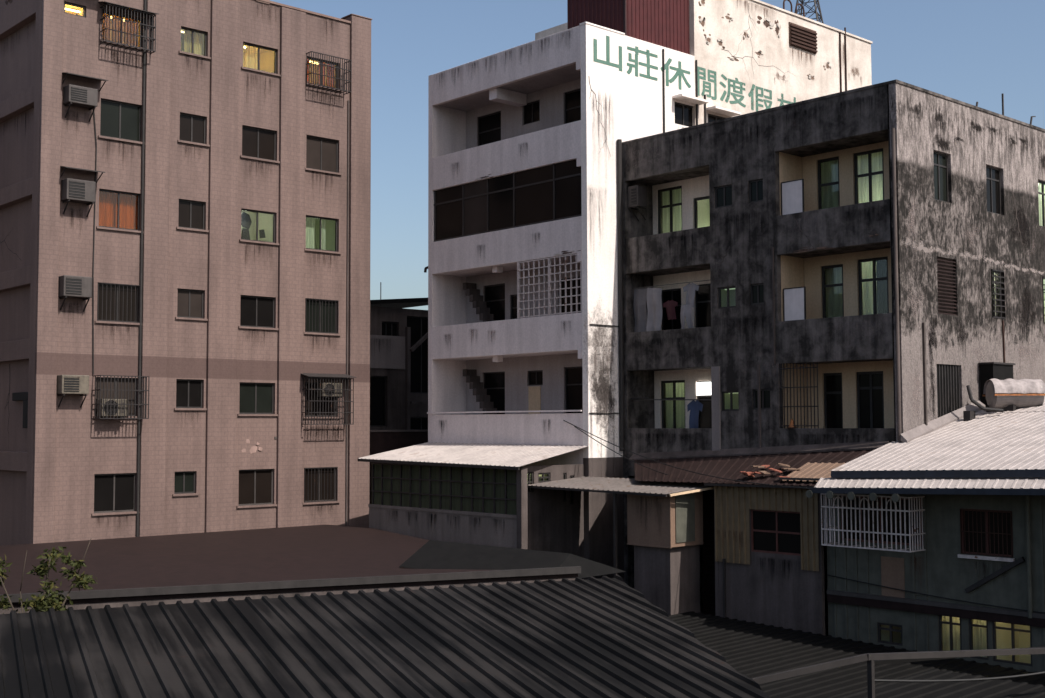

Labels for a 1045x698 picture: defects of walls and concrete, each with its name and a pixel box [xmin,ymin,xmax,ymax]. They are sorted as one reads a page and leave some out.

crack [722,9,792,80]
mould [935,114,964,150]
leakage [901,237,1044,275]
leakage [1020,286,1036,333]
leakage [584,317,615,433]
leakage [928,324,937,413]